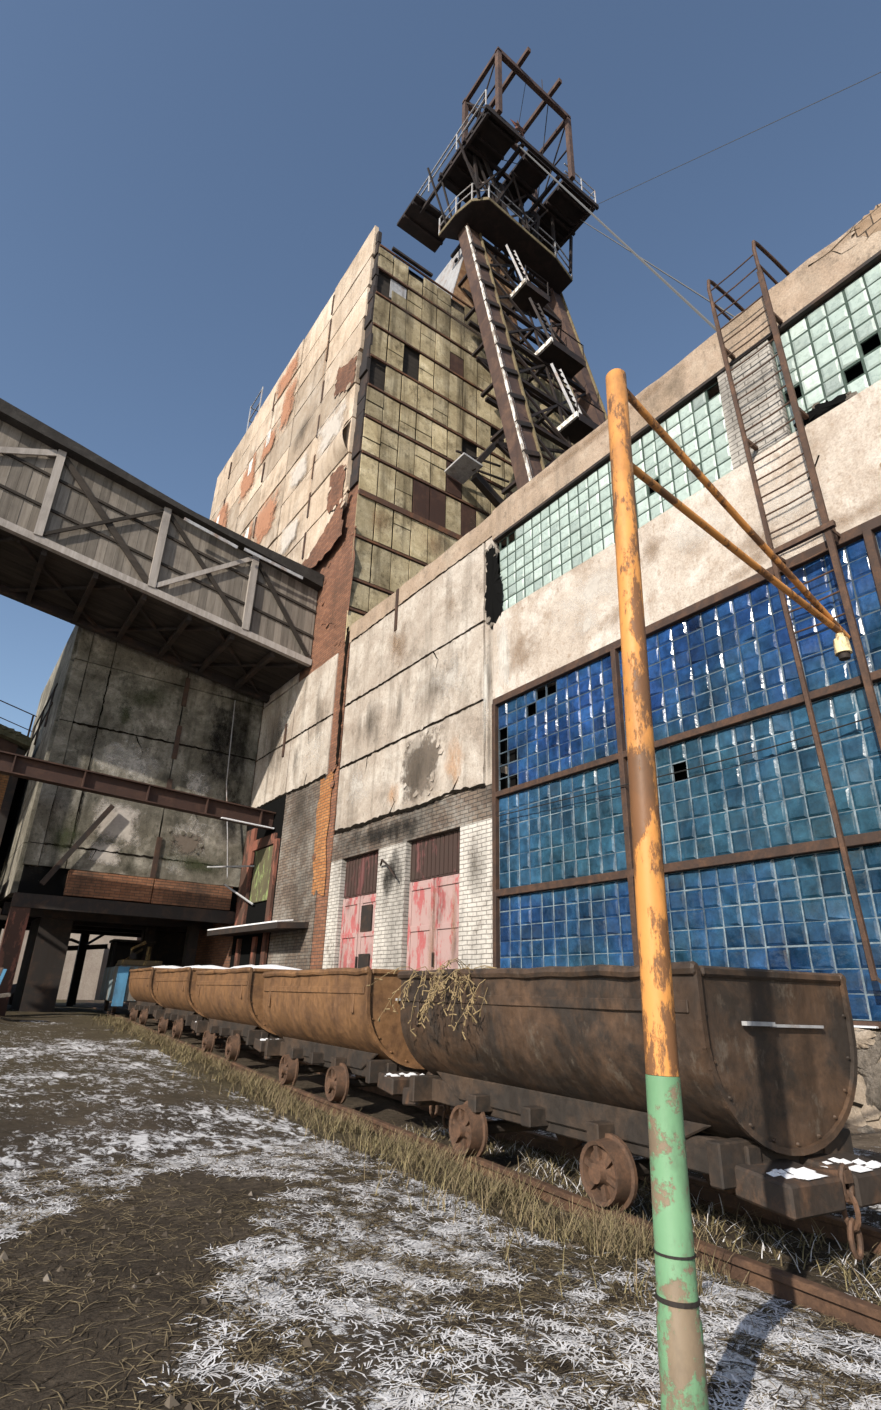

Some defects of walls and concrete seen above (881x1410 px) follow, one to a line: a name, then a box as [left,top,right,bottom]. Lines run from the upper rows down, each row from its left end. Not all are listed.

peeling [215,349,299,527]
flaking render [243,356,357,554]
flaking render [302,463,357,646]
spalling [484,543,503,629]
damp [189,705,250,803]
damp [90,802,138,864]
damp [221,820,236,837]
spalling [853,1030,881,1121]